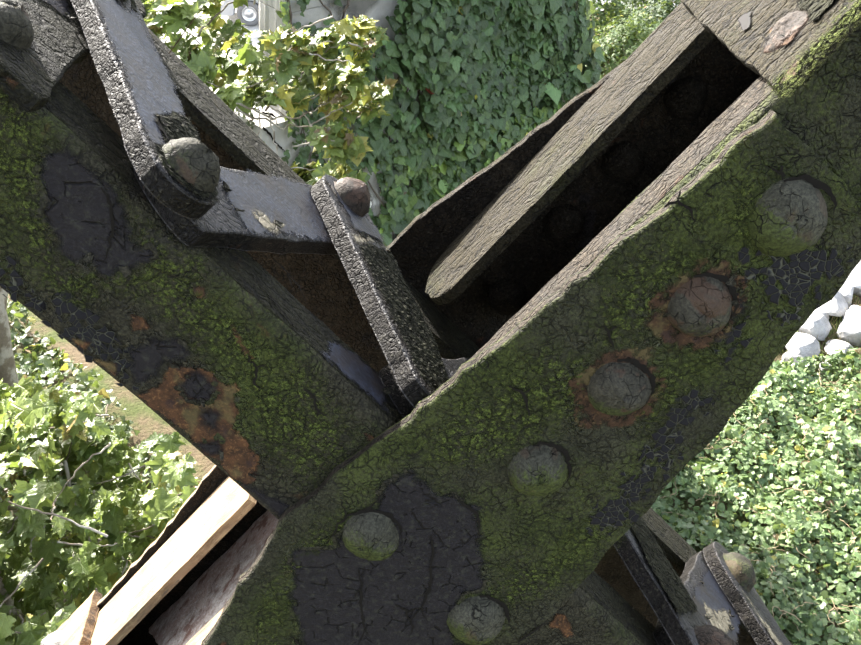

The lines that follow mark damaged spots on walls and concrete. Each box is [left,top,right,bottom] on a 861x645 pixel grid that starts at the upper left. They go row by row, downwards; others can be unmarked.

corrosion [644,258,750,351]
corrosion [137,363,260,486]
corrosion [568,347,667,429]
peeling [243,484,293,517]
peeling [286,468,488,645]